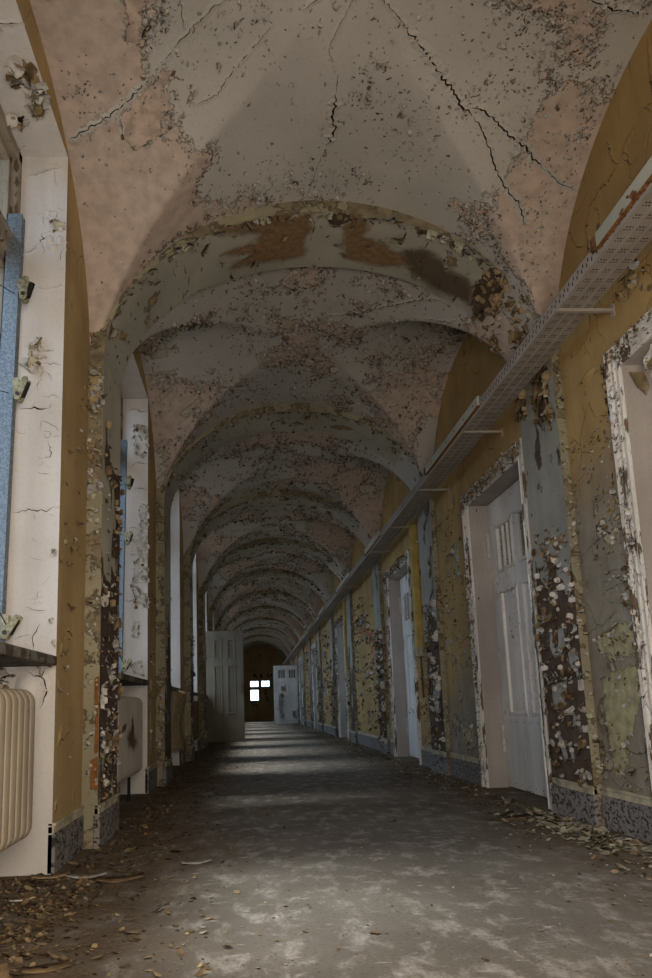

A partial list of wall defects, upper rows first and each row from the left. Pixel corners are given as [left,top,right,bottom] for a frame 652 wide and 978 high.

crack [584,0,648,19]
spalling [4,55,51,133]
crack [68,0,228,141]
crack [193,22,276,108]
crack [299,0,355,197]
crack [379,0,579,228]
crack [24,204,70,292]
peeling [18,337,47,377]
peeling [49,0,652,802]
peeling [0,669,16,688]